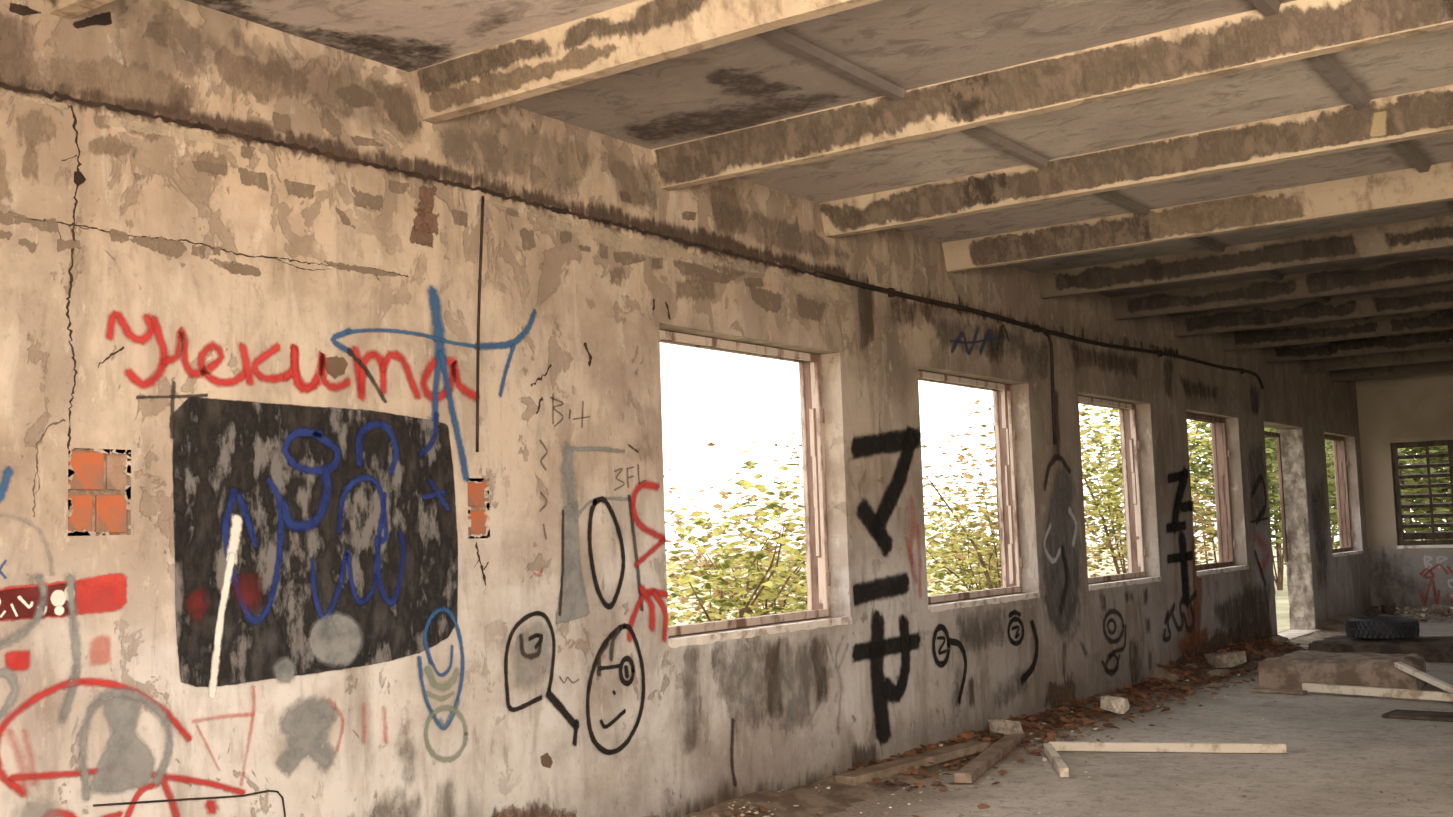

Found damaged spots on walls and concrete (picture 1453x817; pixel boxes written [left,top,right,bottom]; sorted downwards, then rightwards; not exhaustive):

peeling [682,186,742,238]
peeling [494,202,852,321]
crack [0,82,854,517]
flaking render [68,448,131,536]
flaking render [467,478,490,539]
damp [444,791,453,817]
damp [492,804,575,817]